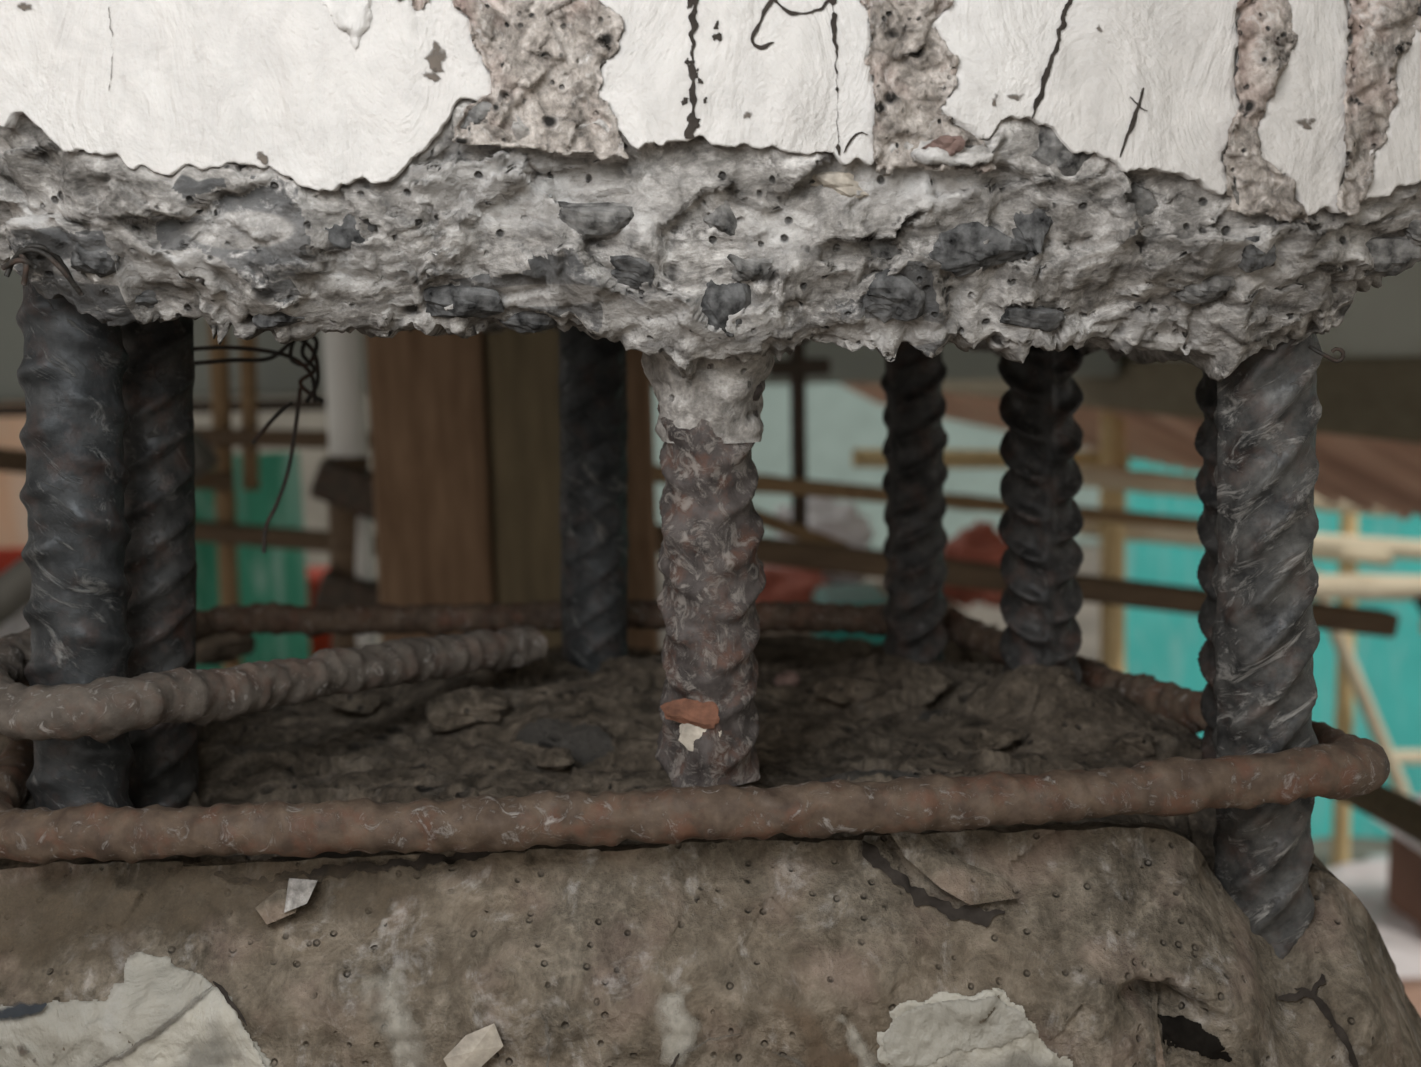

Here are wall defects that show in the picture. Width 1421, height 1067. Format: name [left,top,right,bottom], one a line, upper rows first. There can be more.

crack [681,0,868,155]
crack [1031,0,1073,119]
spalling [0,0,1421,788]
spalling [26,722,199,810]
spalling [1213,797,1315,959]
peeling [0,952,271,1067]
peeling [877,988,1073,1067]
spalling [1149,973,1232,1067]